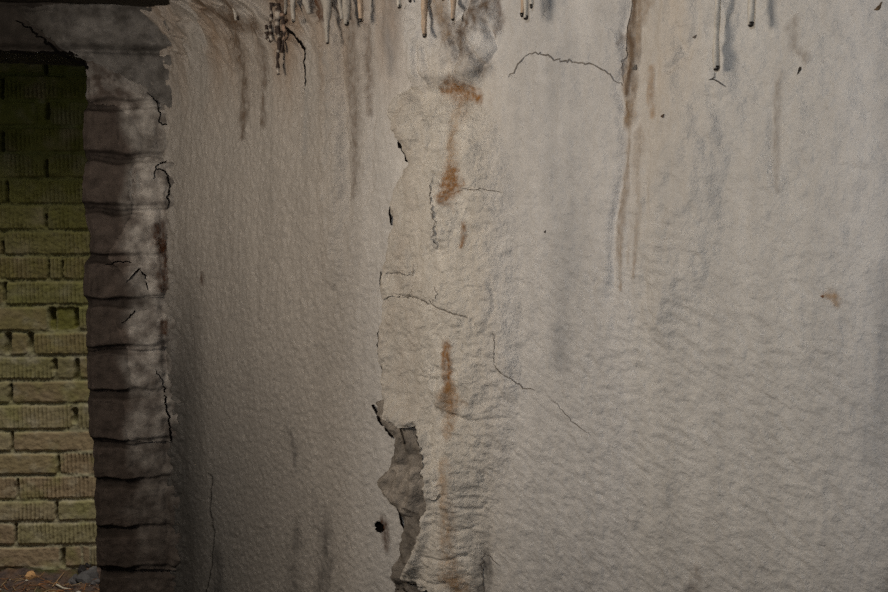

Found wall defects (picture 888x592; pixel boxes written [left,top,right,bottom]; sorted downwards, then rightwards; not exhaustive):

crack [508,2,633,85]
leakage [624,0,640,123]
crack [153,160,171,209]
corrosion [438,168,459,201]
crack [106,261,148,290]
peeling [376,87,524,592]
corrosion [442,345,452,404]